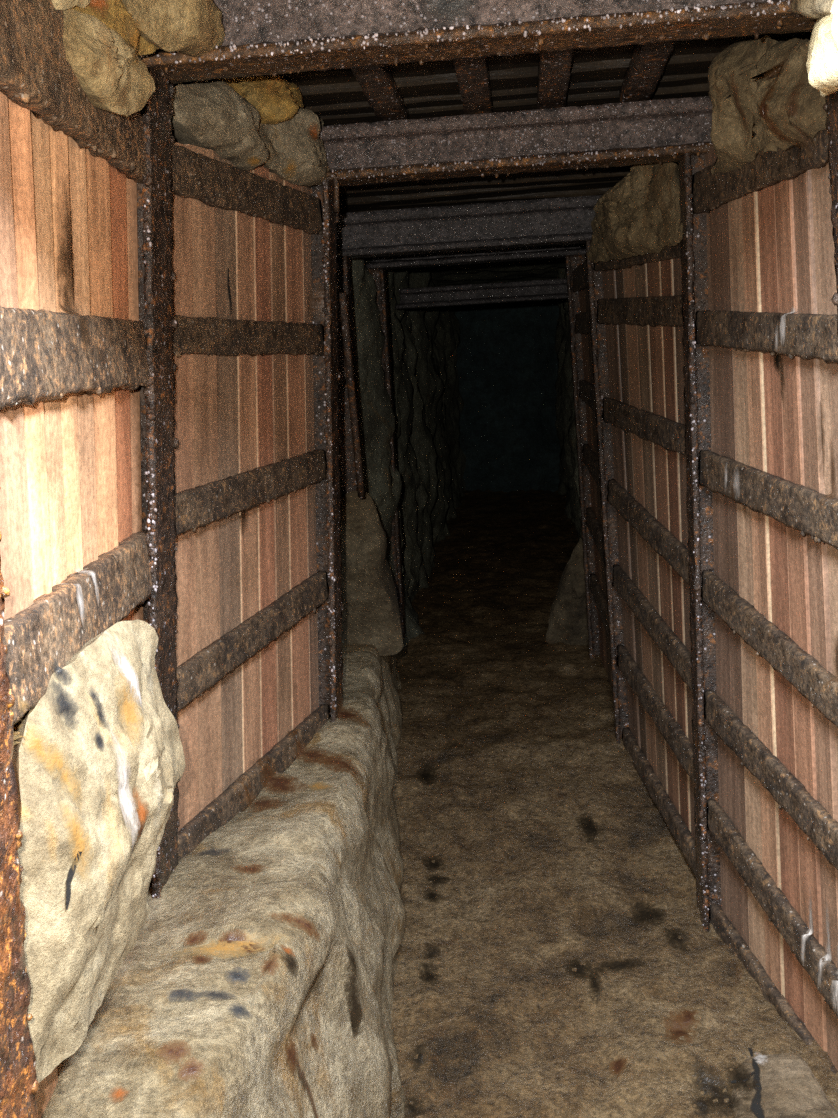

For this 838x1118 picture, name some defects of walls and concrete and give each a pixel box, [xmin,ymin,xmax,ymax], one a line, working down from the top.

leakage [802,902,813,963]
leakage [819,923,831,975]
crack [731,1048,765,1118]